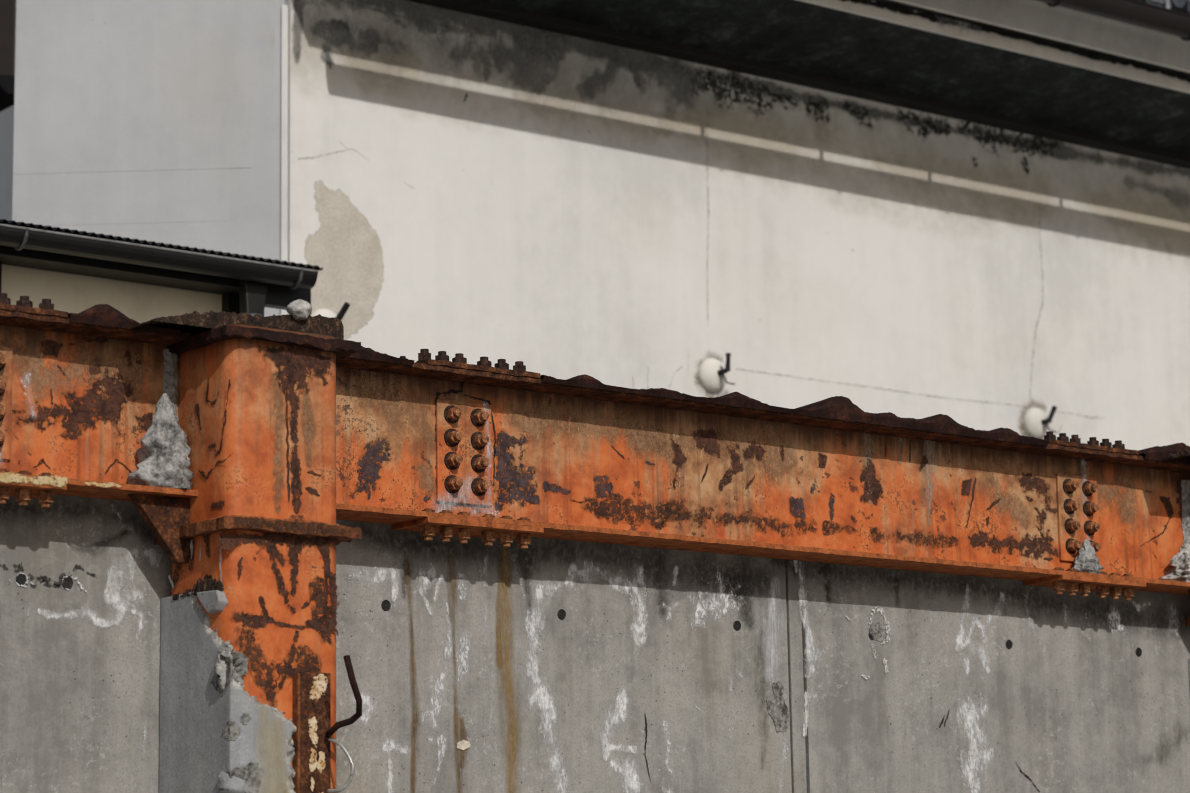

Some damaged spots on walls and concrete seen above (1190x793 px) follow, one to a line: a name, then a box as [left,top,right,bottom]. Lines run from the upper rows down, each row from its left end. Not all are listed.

damp [326,0,1190,206]
flaking render [305,180,384,340]
corrosion [12,350,153,440]
corrosion [171,345,346,706]
corrosion [493,429,857,537]
corrosion [871,473,1058,561]
spalling [210,652,249,696]
spalling [225,714,251,740]
spalling [226,761,264,793]
damp [348,526,780,793]
damp [957,694,993,793]
damp [772,558,1184,678]